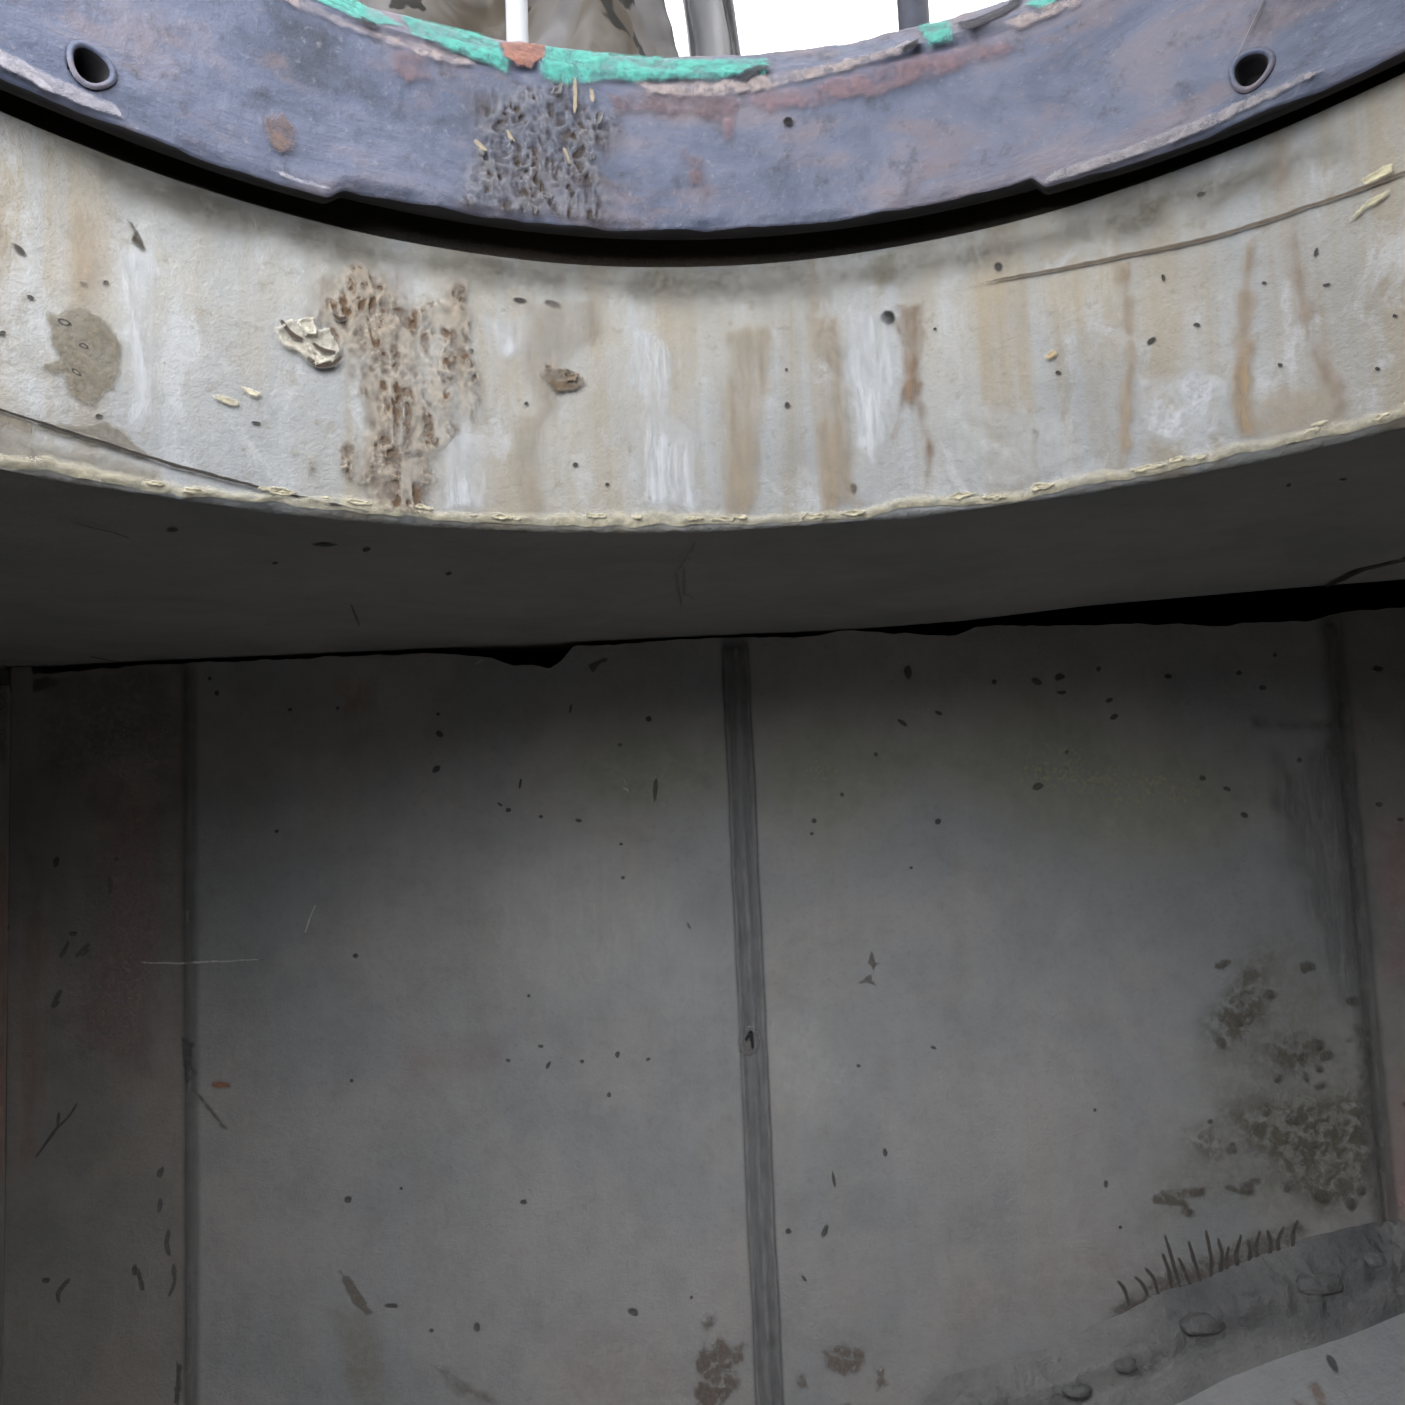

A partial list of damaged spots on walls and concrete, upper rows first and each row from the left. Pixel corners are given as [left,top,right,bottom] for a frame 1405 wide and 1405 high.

crack [988,171,1405,282]
water stain [0,411,161,482]
water stain [43,306,146,411]
spalling [0,264,1405,528]
corrosion [896,306,922,412]
corrosion [1233,290,1254,434]
water stain [1215,969,1276,1049]
water stain [1200,1027,1384,1211]
peeling [694,1317,744,1405]